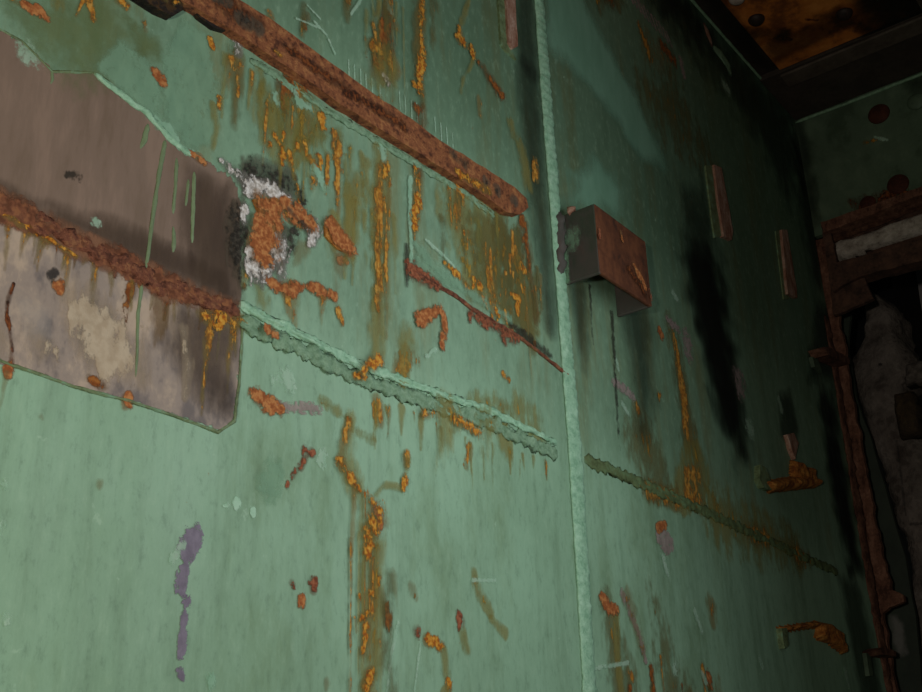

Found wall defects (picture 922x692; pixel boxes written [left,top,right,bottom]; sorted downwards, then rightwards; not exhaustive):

corrosion [180,0,542,332]
peeling [0,28,323,434]
corrosion [0,186,244,389]
damp [67,293,135,382]
corrosion [258,323,279,340]
corrosion [353,352,385,381]
corrosion [342,416,351,446]
corrosion [371,398,390,424]
corrosion [447,407,484,466]
corrosion [401,449,410,492]
corrosion [285,445,393,692]
corrosion [414,627,445,653]